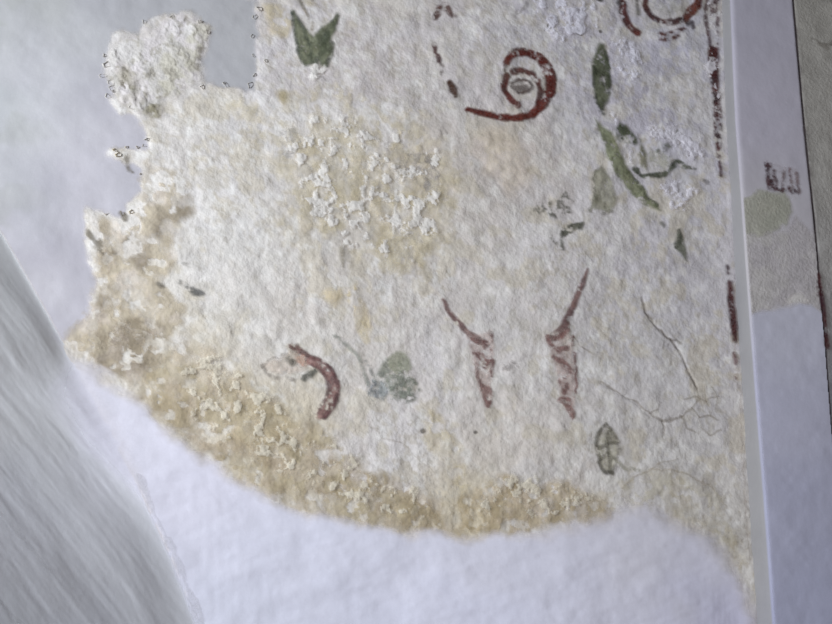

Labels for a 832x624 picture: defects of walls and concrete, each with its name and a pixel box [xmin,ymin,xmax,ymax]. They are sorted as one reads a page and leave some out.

spalling [0,0,265,339]
damp [70,183,440,528]
damp [453,477,580,534]